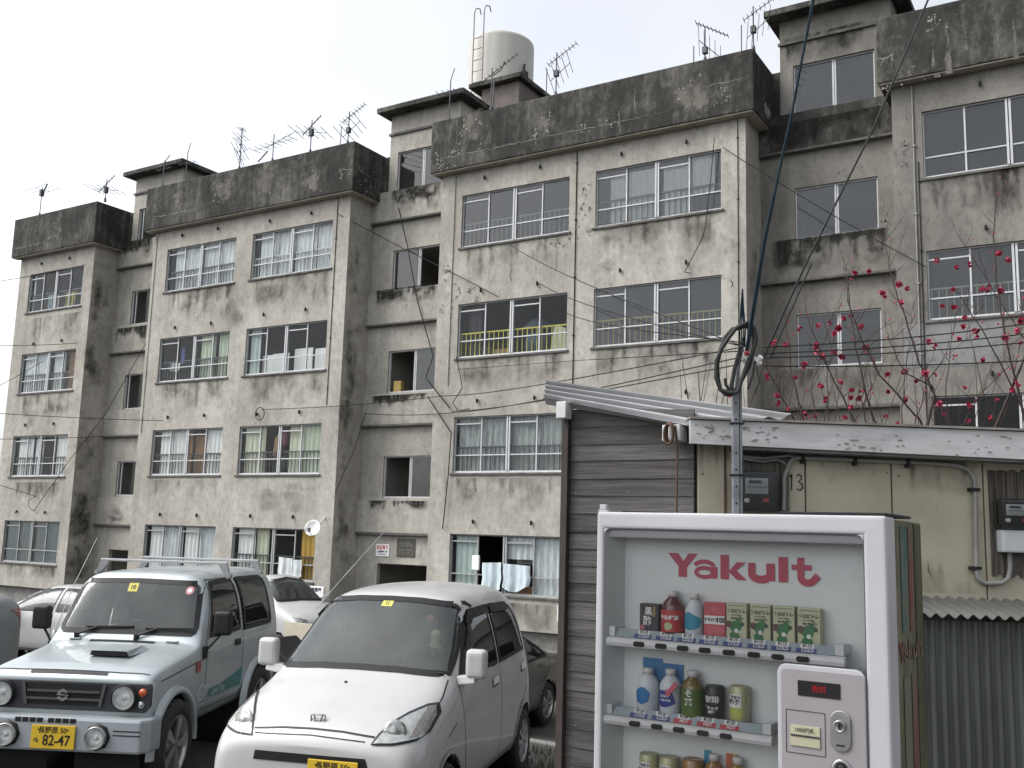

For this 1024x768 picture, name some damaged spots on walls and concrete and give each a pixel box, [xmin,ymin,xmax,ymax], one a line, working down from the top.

peeling [431,112,491,172]
crack [433,110,668,168]
water stain [393,182,439,202]
water stain [775,227,885,269]
water stain [377,283,435,300]
water stain [370,500,424,508]